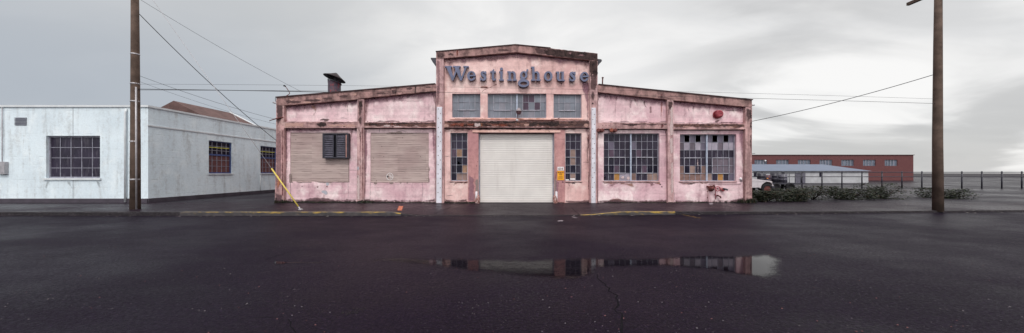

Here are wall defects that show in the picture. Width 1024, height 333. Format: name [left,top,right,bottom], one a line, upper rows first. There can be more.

spalling [289,159,430,199]
leakage [275,48,752,203]